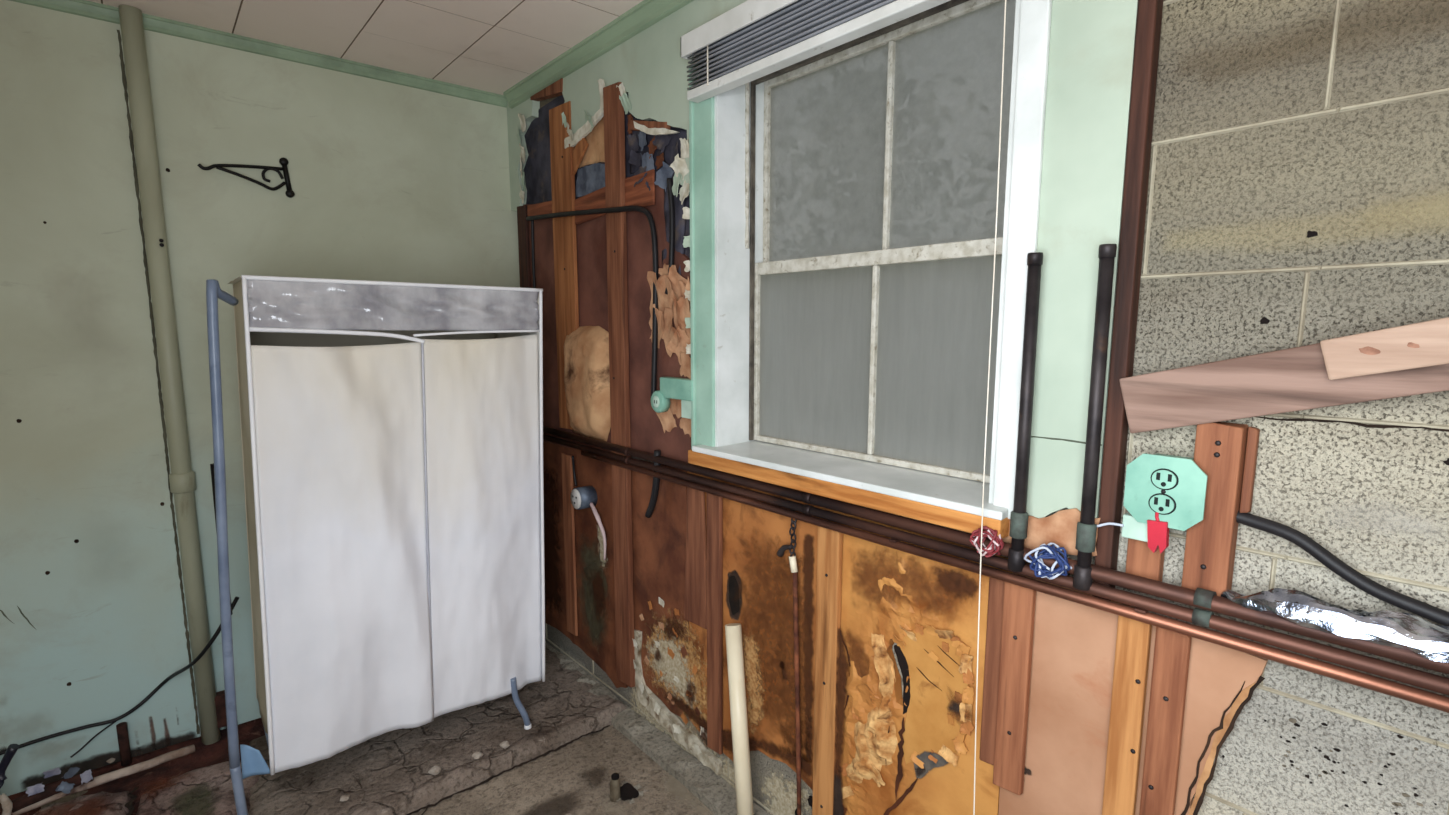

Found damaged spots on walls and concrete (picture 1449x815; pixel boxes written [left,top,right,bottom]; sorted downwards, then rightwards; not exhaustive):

flaking render [517,113,526,204]
flaking render [561,79,690,272]
crack [125,786,140,815]
peeling [632,597,723,775]
leakage [631,535,814,815]
peeling [841,693,898,815]